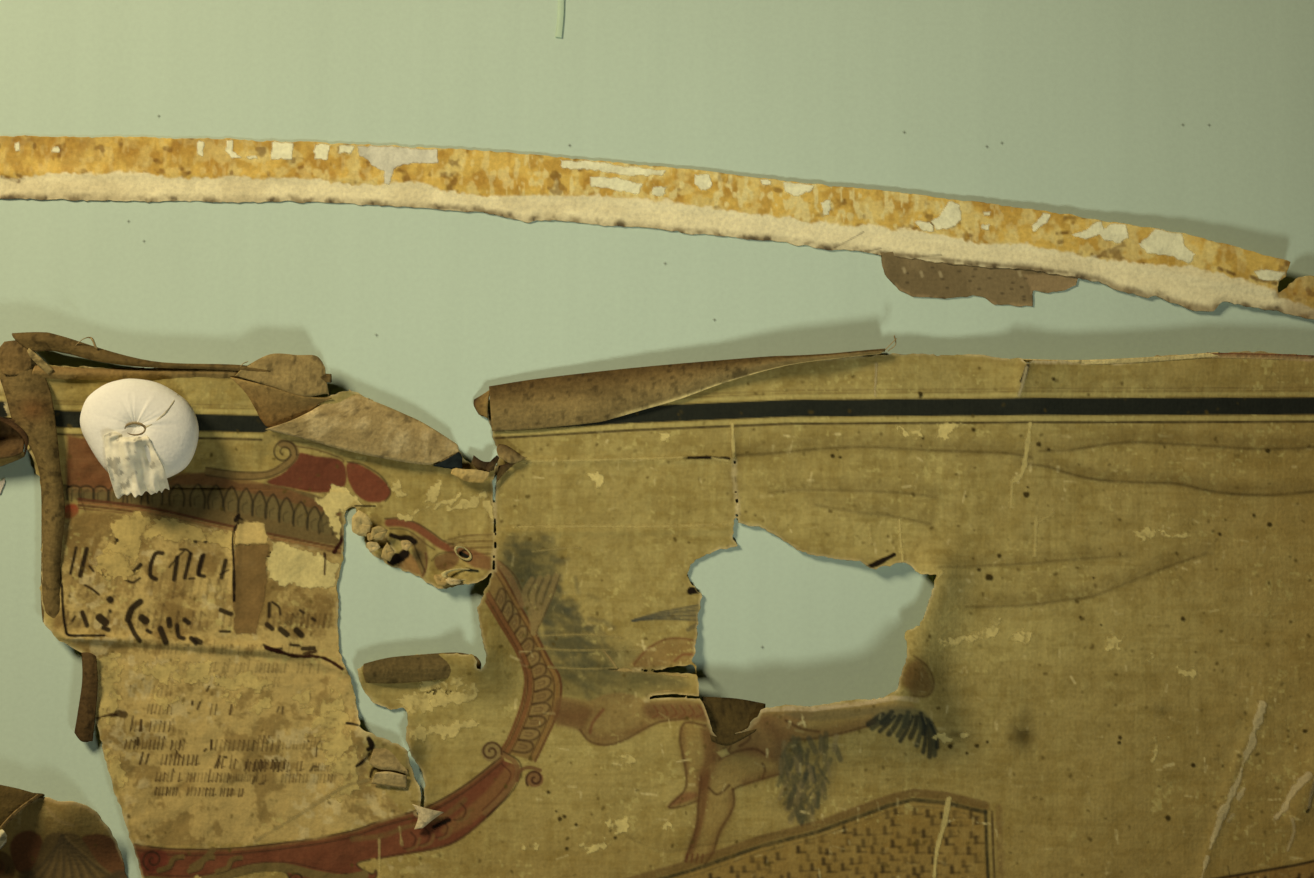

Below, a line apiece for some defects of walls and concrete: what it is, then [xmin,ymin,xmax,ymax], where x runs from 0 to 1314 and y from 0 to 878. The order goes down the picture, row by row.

peeling [226,140,293,159]
peeling [313,144,438,184]
peeling [561,160,665,196]
peeling [694,174,712,190]
peeling [761,180,814,196]
peeling [915,201,961,232]
peeling [1032,213,1050,231]
peeling [1073,222,1195,263]
peeling [1255,270,1285,281]
peeling [97,652,272,724]
peeling [396,678,479,742]
peeling [292,687,363,802]